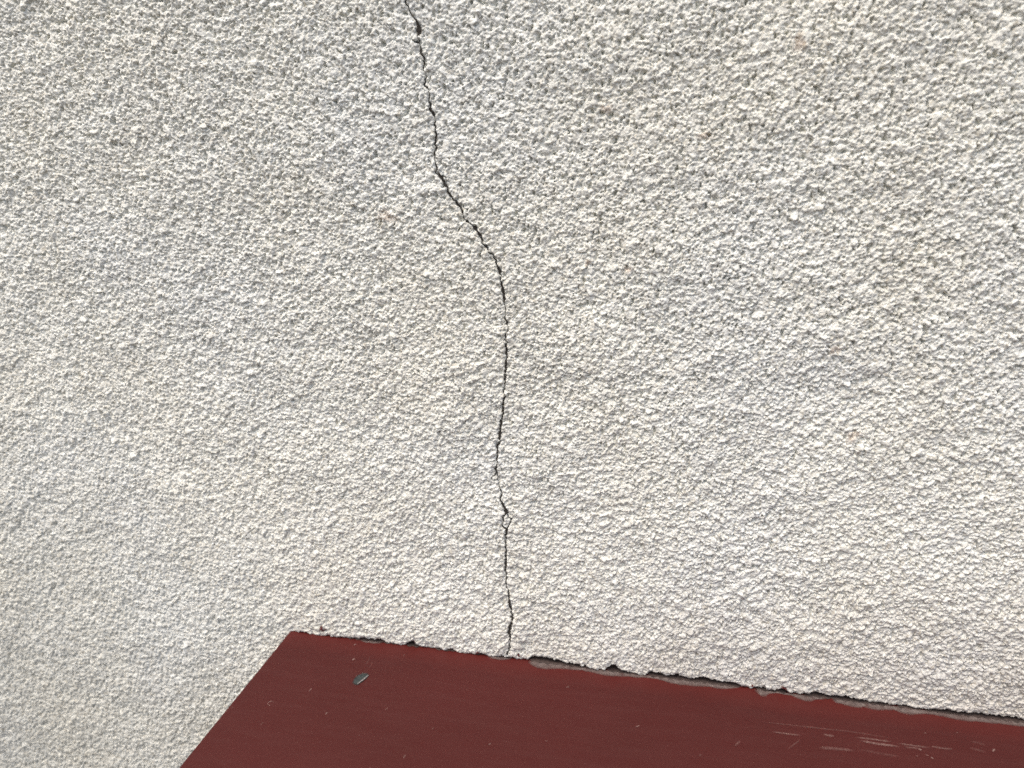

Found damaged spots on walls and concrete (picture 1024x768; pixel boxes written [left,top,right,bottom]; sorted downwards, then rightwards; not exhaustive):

crack [405,0,514,655]